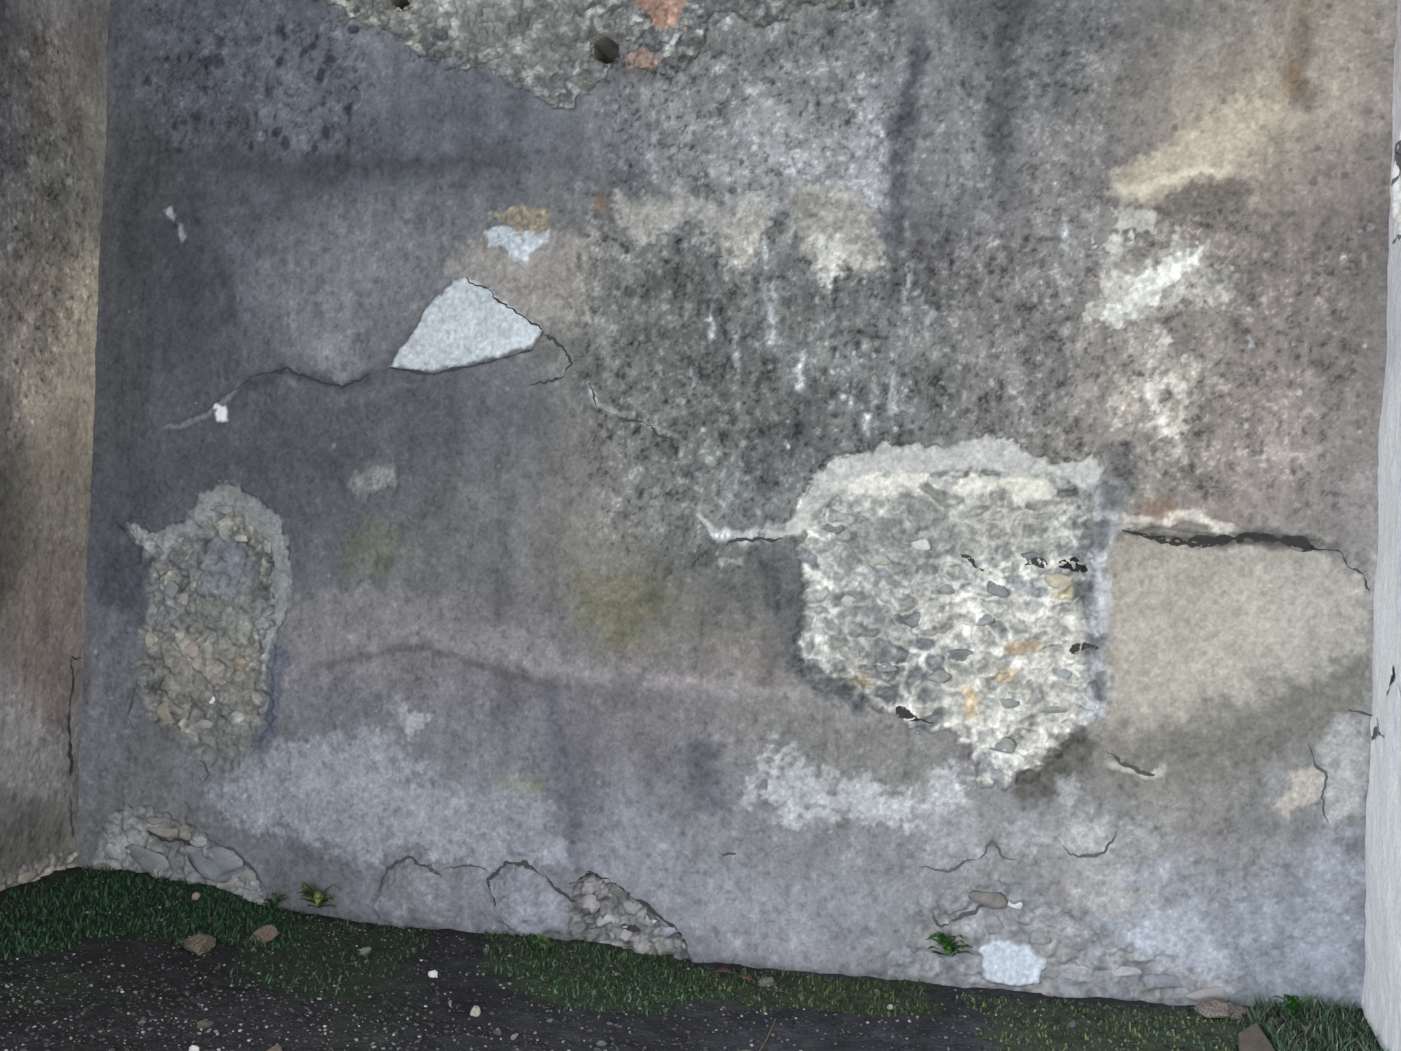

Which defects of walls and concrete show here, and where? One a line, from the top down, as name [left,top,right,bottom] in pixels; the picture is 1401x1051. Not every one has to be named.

flaking render [323,0,893,110]
crack [166,358,393,432]
spalling [390,331,544,375]
crack [466,277,683,440]
crack [1110,491,1370,593]
spalling [96,479,295,774]
spalling [772,430,1239,1006]
spalling [0,804,268,906]
crack [438,864,491,874]
spalling [565,871,691,961]